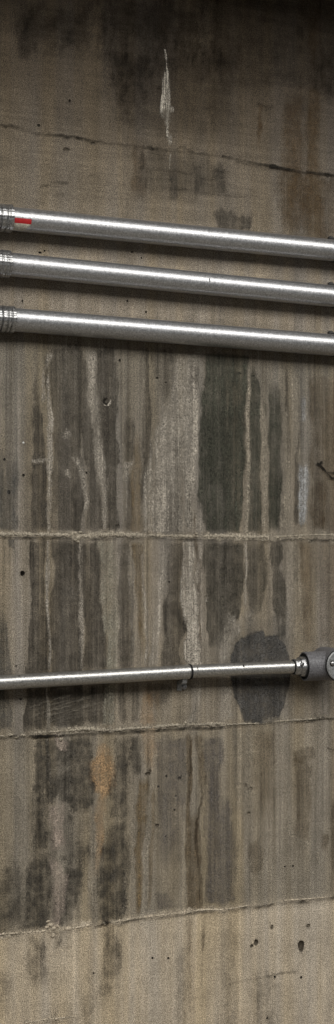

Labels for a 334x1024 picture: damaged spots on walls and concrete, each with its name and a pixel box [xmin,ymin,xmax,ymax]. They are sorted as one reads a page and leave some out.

crack [259,163,334,176]
damp [26,348,308,674]
damp [0,685,150,934]